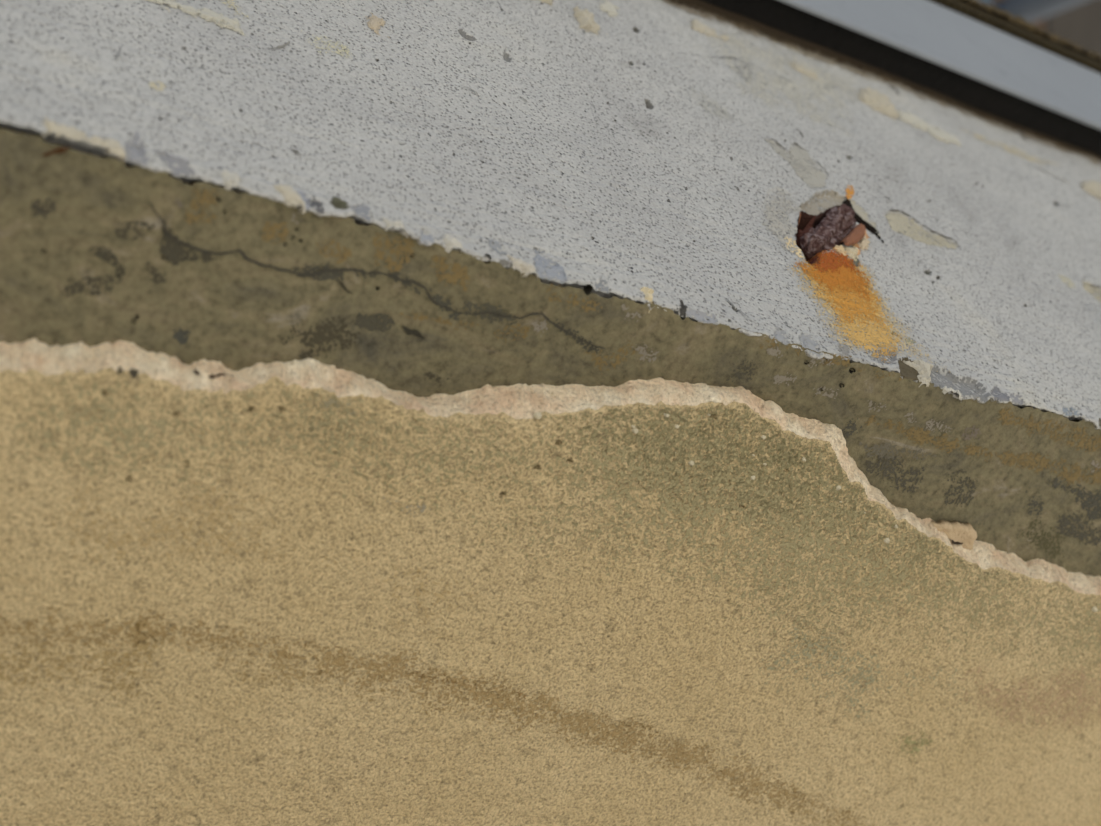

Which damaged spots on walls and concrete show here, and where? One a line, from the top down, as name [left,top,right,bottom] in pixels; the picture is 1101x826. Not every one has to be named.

peeling [124,131,195,178]
peeling [297,191,371,222]
crack [150,202,606,349]
peeling [533,248,567,283]
peeling [583,279,609,295]
peeling [679,298,718,324]
spalling [795,189,881,266]
rust [785,224,947,369]
spalling [0,326,1101,595]
leakage [0,601,877,826]